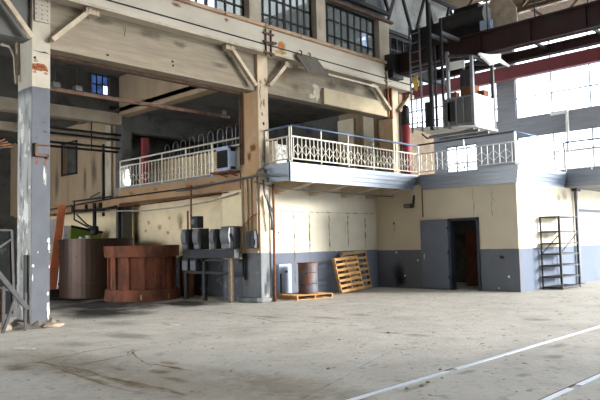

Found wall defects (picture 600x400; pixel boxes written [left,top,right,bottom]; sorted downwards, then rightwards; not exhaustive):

spalling [32,56,48,75]
spalling [309,83,322,103]
peeling [19,108,30,165]
peeling [17,186,30,255]